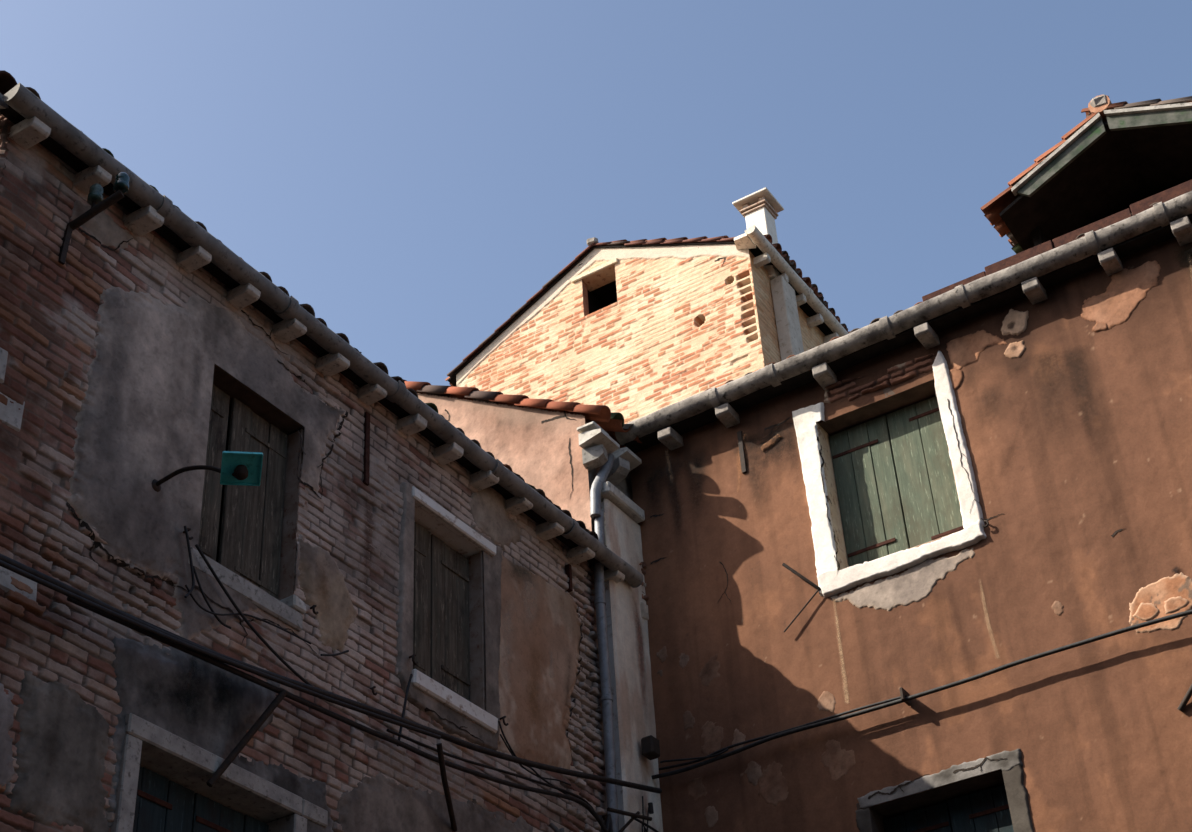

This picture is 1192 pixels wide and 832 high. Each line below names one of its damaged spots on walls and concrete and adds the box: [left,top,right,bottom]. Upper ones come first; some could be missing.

flaking render [1081,260,1161,332]
flaking render [824,309,1029,403]
crack [298,411,348,499]
crack [947,399,1000,520]
flaking render [1129,567,1192,633]